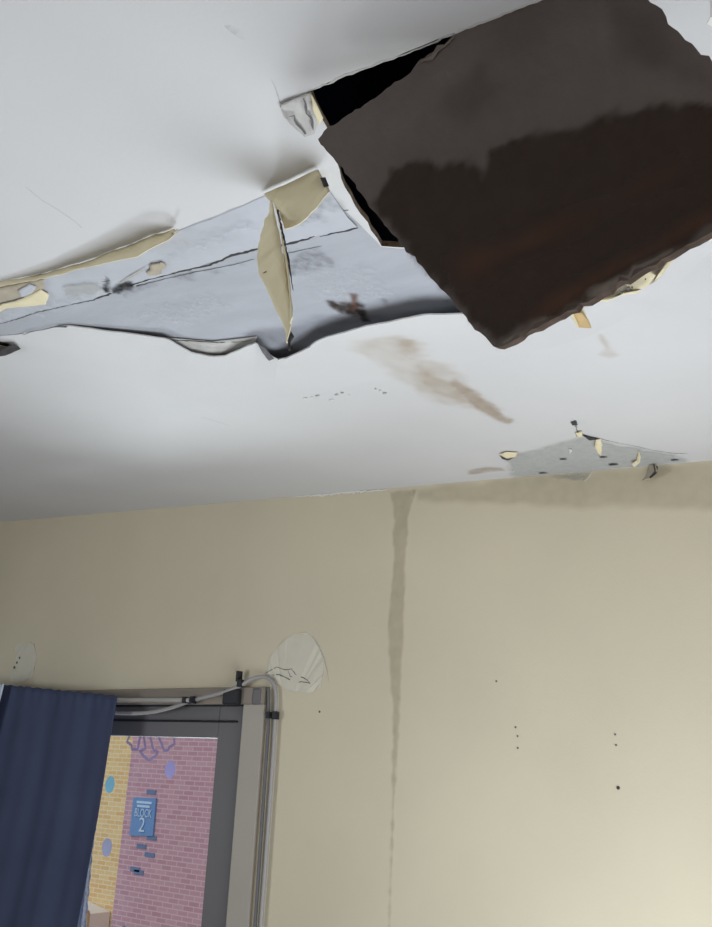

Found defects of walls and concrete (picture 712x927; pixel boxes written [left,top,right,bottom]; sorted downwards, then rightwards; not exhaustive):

peeling [292,0,542,99]
water stain [375,104,712,338]
peeling [0,169,462,359]
peeling [599,260,673,302]
peeling [570,309,591,328]
peeling [499,452,518,460]
peeling [594,439,617,466]
peeling [631,451,658,481]